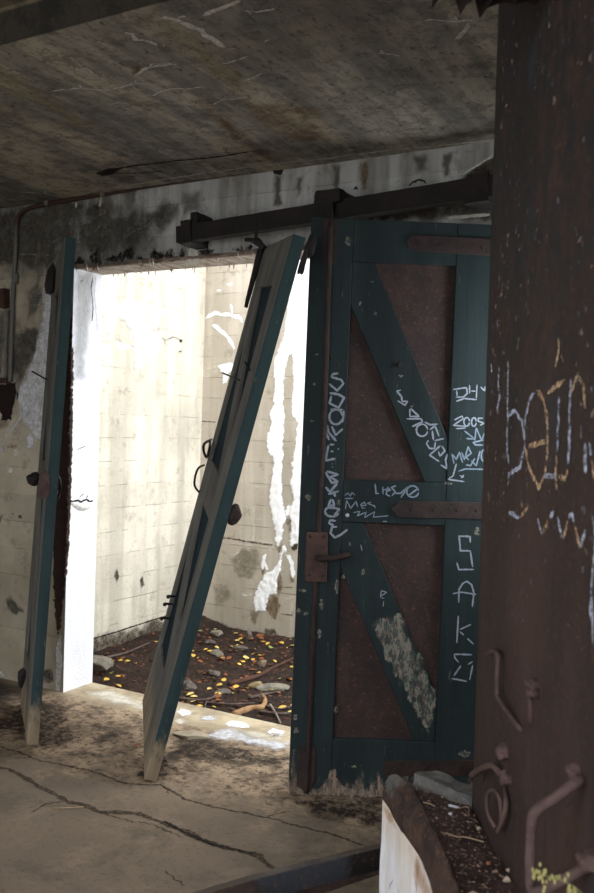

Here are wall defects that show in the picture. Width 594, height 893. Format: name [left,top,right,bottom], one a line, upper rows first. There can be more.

damp [0,140,493,380]
damp [0,313,38,442]
damp [205,362,233,384]
damp [242,259,310,635]
crack [0,746,361,869]